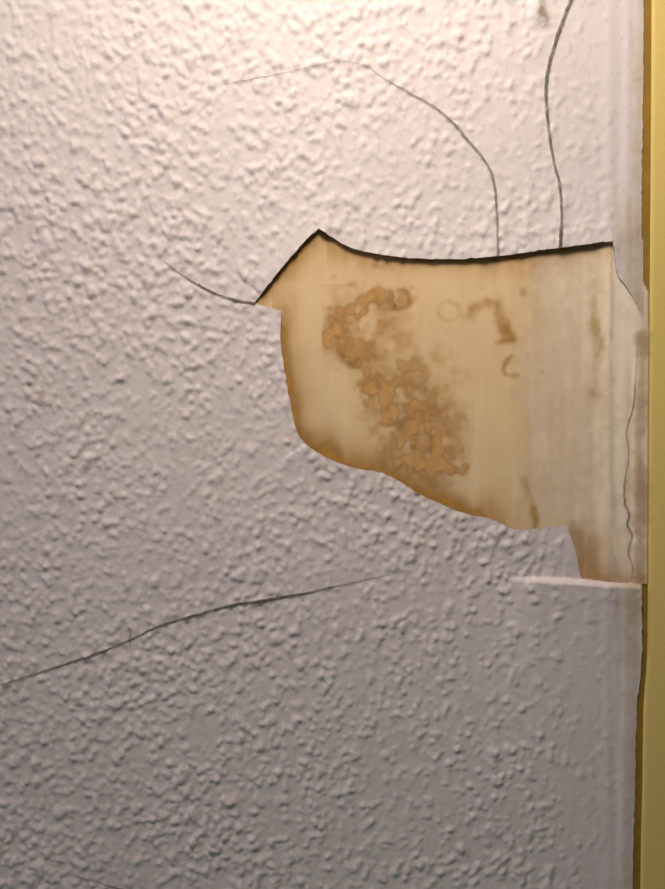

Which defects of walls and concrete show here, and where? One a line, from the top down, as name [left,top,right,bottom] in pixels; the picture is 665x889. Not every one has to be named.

crack [395,84,500,256]
crack [544,0,573,247]
crack [173,268,255,305]
damp [257,233,315,300]
damp [280,319,302,439]
damp [310,287,486,518]
peeling [255,229,648,590]
damp [500,323,515,342]
crack [9,583,347,683]